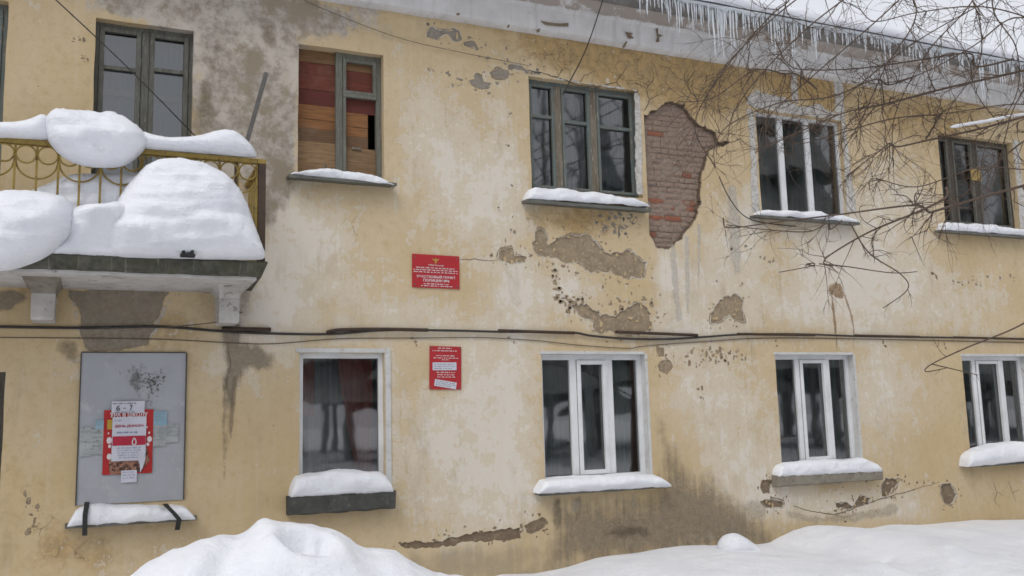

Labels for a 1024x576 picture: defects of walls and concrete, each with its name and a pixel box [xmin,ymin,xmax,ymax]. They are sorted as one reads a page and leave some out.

peeling [426,13,546,97]
flaking render [490,101,730,347]
damp [223,323,269,404]
peeling [652,282,747,380]
spalling [393,511,549,549]
damp [559,459,765,559]
peeling [755,474,789,514]
peeling [826,474,962,522]